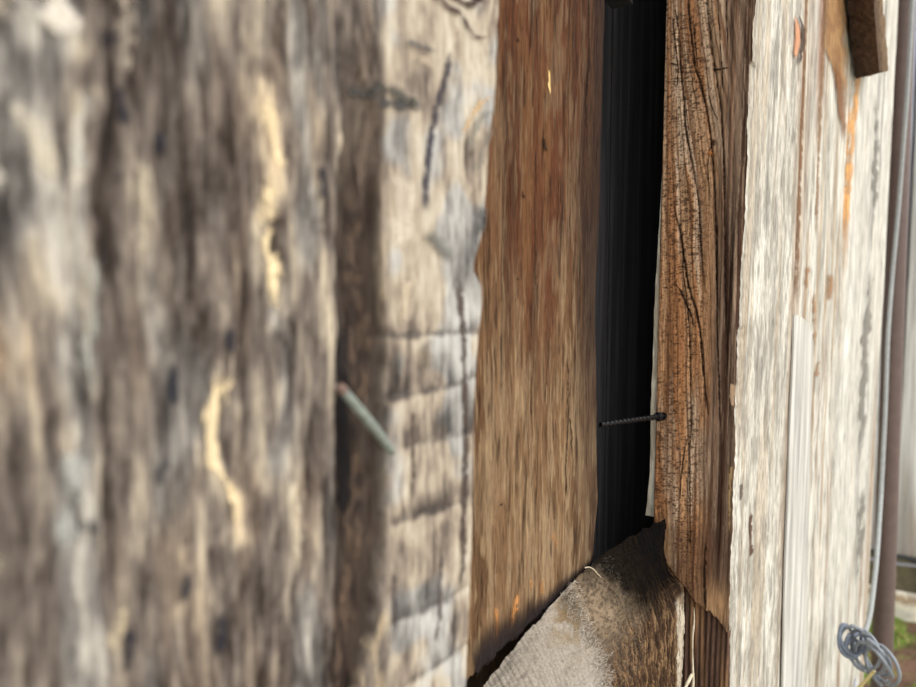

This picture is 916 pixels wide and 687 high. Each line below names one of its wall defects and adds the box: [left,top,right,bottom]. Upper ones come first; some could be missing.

crack [668,1,728,625]
rust [843,78,860,237]